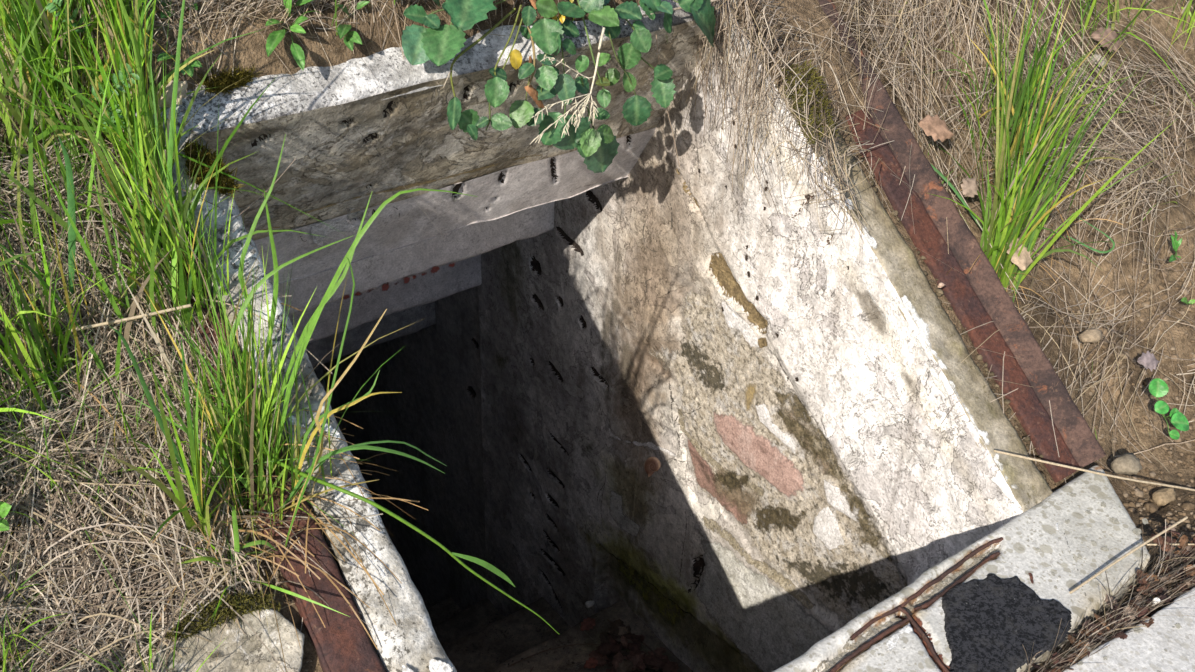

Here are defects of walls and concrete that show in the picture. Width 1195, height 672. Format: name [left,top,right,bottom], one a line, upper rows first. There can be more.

peeling [863,227,877,248]
flaking render [651,288,1016,672]
peeling [429,659,452,672]